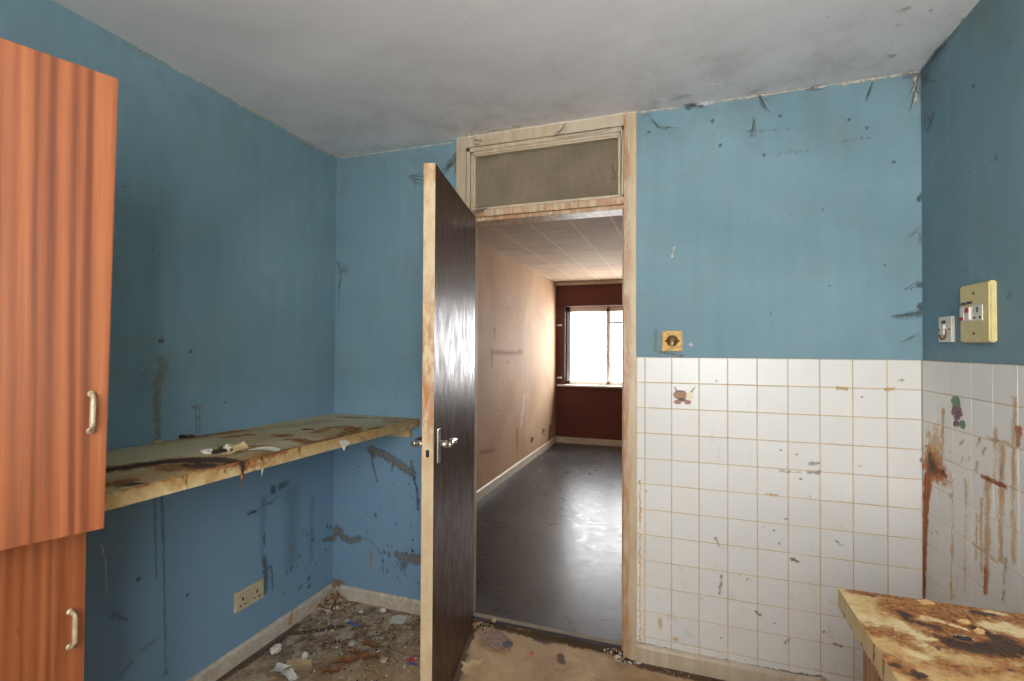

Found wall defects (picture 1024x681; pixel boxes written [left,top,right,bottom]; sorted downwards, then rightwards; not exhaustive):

peeling [639,71,918,114]
rust [922,428,951,599]
peeling [387,545,421,578]